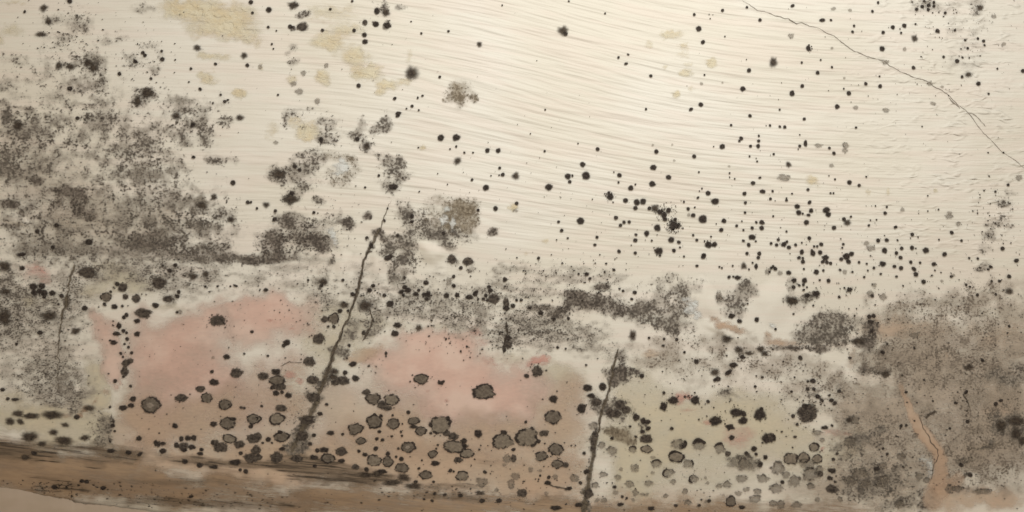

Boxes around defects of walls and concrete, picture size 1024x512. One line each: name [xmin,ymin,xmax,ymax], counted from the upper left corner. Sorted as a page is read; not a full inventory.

crack [738,0,1024,171]
water stain [880,0,999,99]
water stain [438,134,526,191]
water stain [545,162,590,198]
water stain [604,171,719,266]
water stain [735,192,765,255]
water stain [785,193,813,225]
water stain [817,207,852,230]
crack [282,204,389,455]
crack [580,349,618,512]